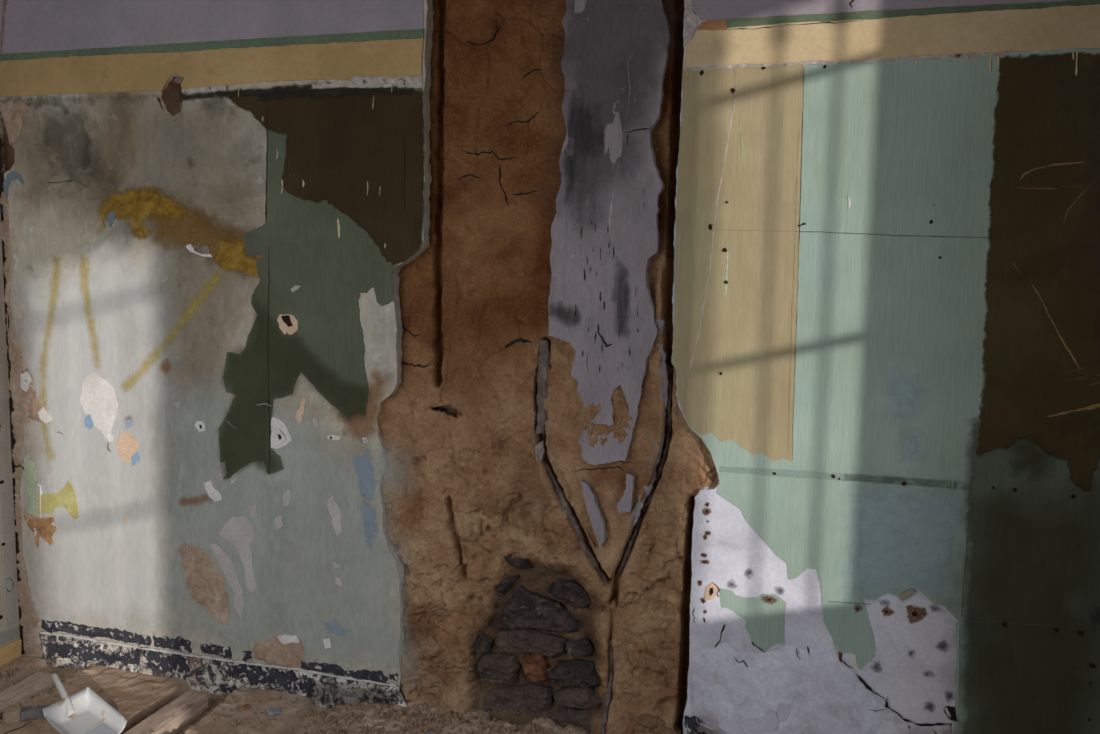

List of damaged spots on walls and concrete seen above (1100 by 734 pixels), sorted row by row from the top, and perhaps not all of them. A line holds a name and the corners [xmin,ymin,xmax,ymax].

spalling [684,0,698,46]
spalling [157,76,423,122]
spalling [0,99,399,693]
spalling [535,340,608,582]
spalling [627,319,669,541]
spalling [704,582,720,600]
crack [841,659,952,734]